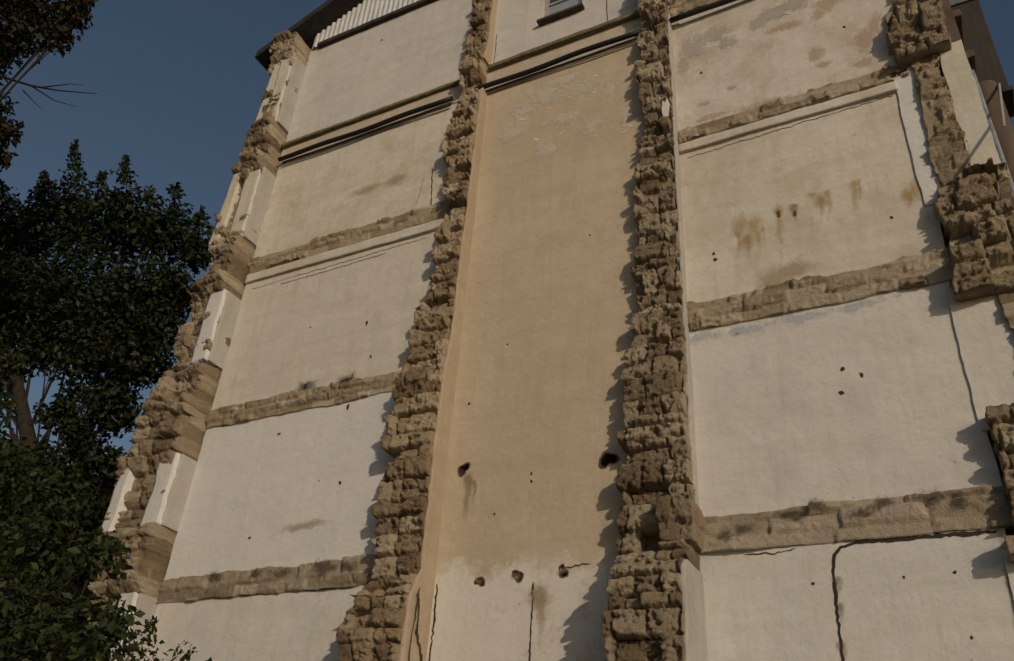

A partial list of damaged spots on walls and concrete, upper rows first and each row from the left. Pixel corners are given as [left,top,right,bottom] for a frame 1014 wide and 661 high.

spalling [458,462,471,477]
hole [598,453,620,469]
crack [408,584,438,661]
spalling [512,570,524,583]
crack [527,582,535,661]
crack [831,530,997,661]